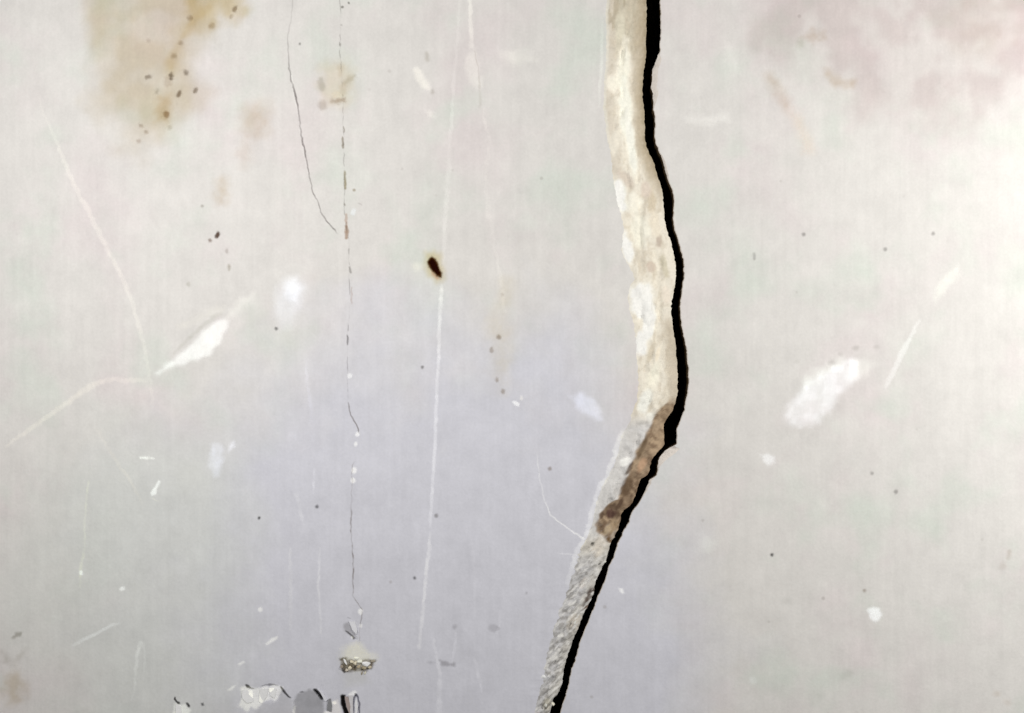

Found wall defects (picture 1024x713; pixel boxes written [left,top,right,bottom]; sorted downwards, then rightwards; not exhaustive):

corrosion [428,257,442,277]
crack [535,0,690,713]
flaking render [340,657,376,675]
peeling [242,685,289,703]
peeling [314,688,360,713]